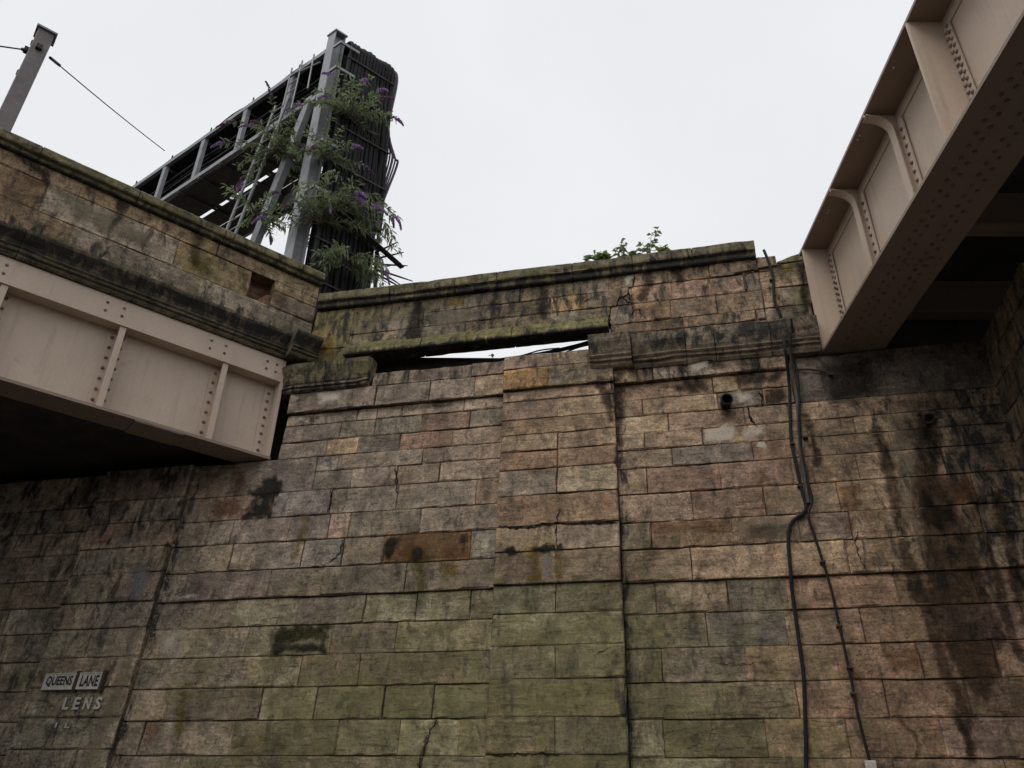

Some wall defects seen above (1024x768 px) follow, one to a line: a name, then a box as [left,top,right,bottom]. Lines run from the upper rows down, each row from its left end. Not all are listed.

crack [608,274,641,327]
crack [498,510,618,533]